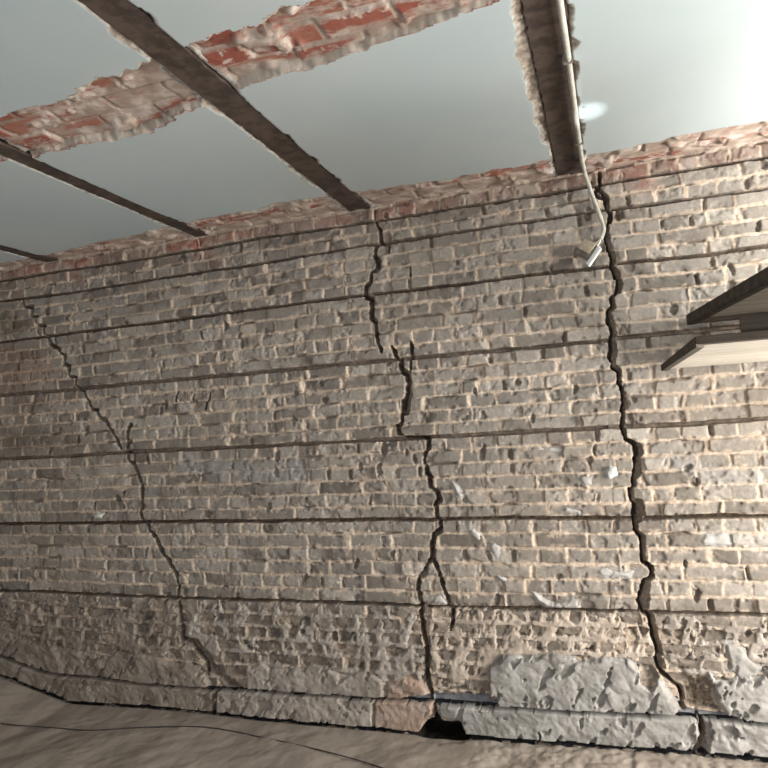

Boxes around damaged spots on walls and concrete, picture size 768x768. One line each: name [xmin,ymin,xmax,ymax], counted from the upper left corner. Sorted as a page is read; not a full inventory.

spalling [72,0,374,211]
crack [21,297,224,716]
crack [362,209,455,714]
crack [593,171,707,755]
spalling [418,711,471,740]